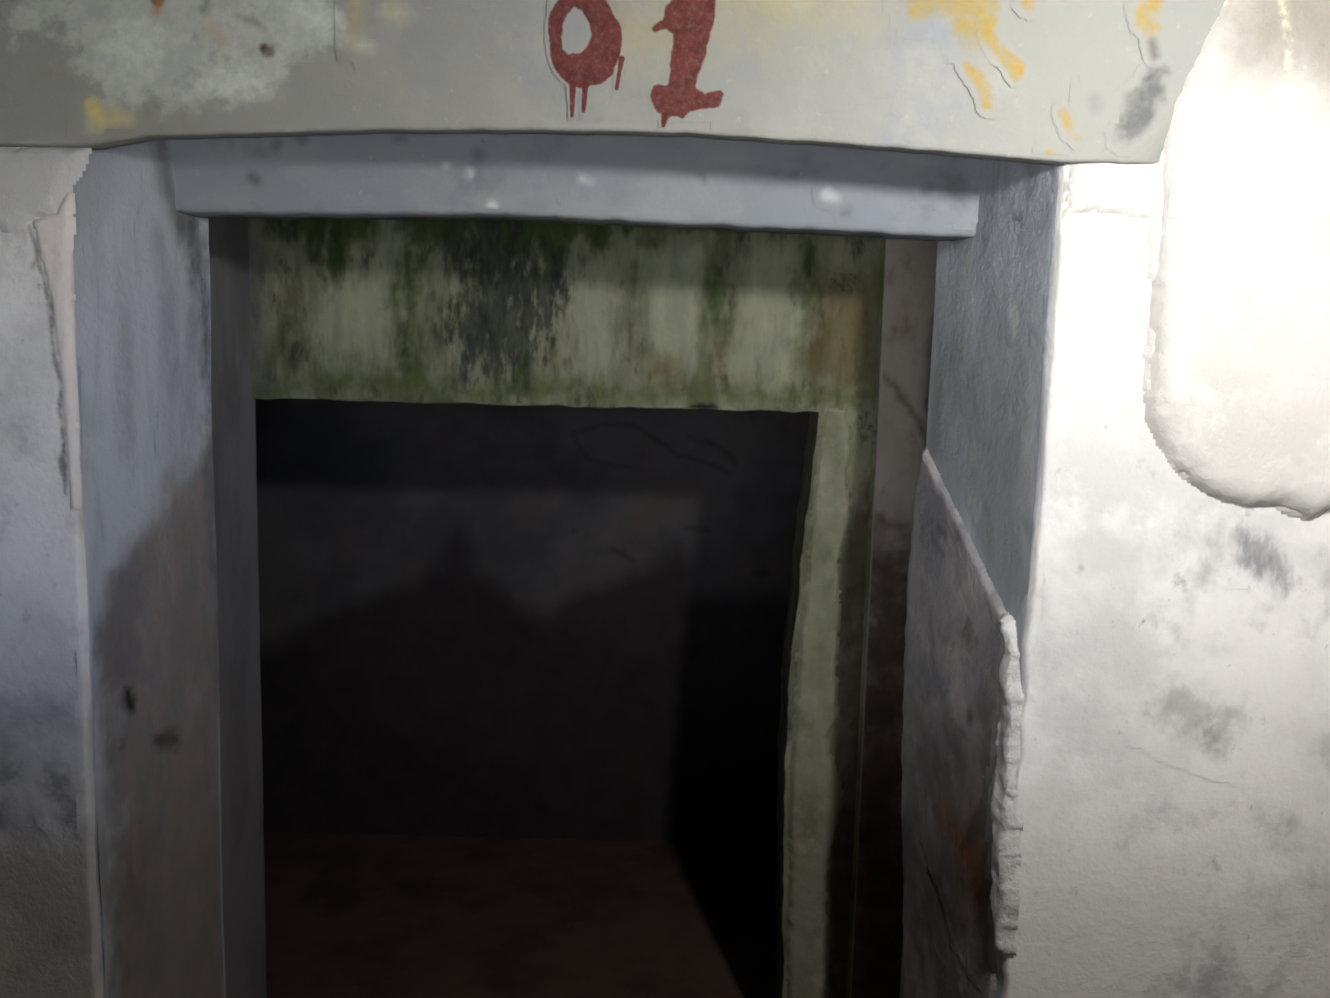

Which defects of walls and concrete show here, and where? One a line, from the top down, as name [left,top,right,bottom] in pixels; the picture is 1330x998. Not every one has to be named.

damp [0,629,78,854]
peeling [33,192,82,511]
spalling [112,676,188,764]
damp [80,195,224,998]
damp [248,218,873,409]
flaking render [785,408,852,998]
damp [824,450,919,998]
flaking render [901,447,1024,998]